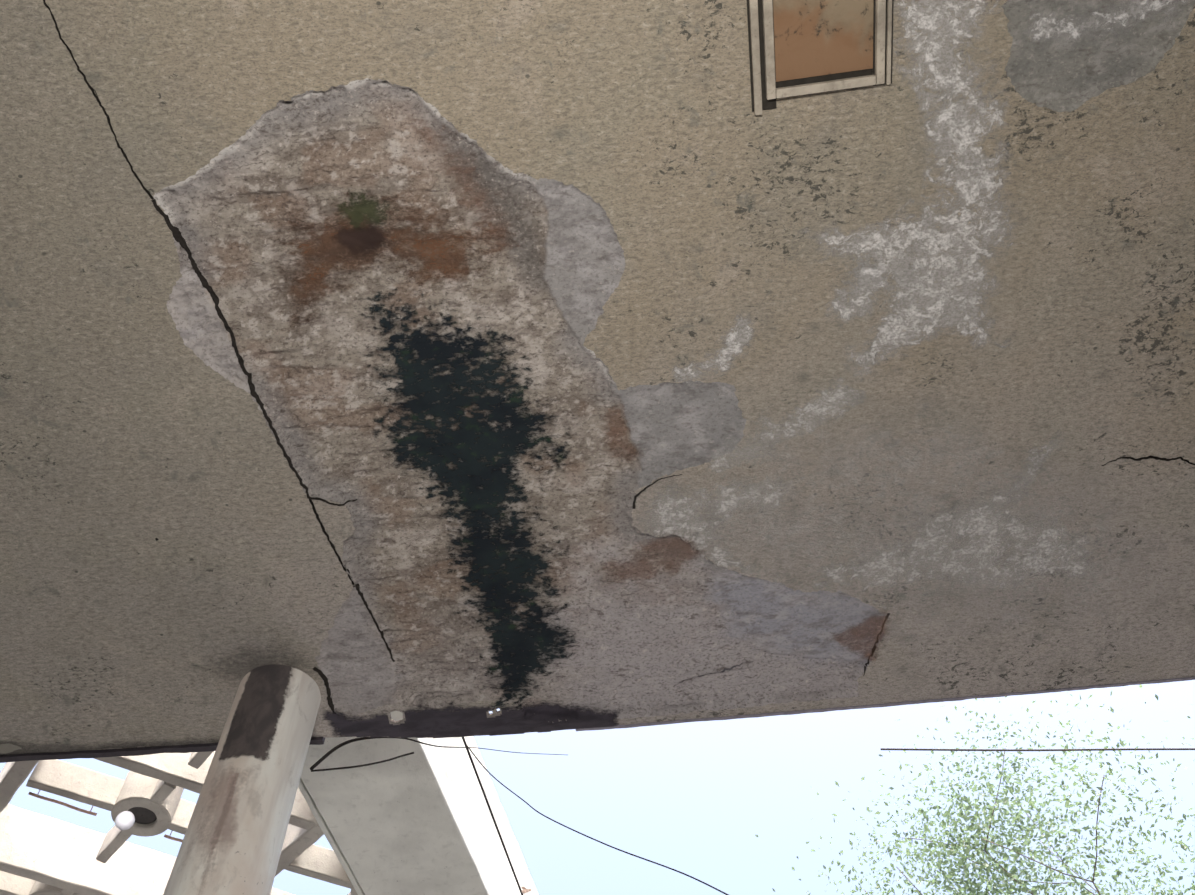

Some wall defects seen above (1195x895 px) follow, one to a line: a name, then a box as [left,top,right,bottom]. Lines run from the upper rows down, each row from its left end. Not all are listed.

flaking render [1001,0,1195,112]
leakage [1029,0,1185,42]
leakage [820,0,1012,369]
crack [43,0,395,662]
rust [274,193,503,327]
leakage [323,289,618,738]
flaking render [154,78,890,723]
leakage [674,316,752,383]
leakage [650,378,863,574]
leakage [815,442,1089,590]
crack [1101,455,1195,466]